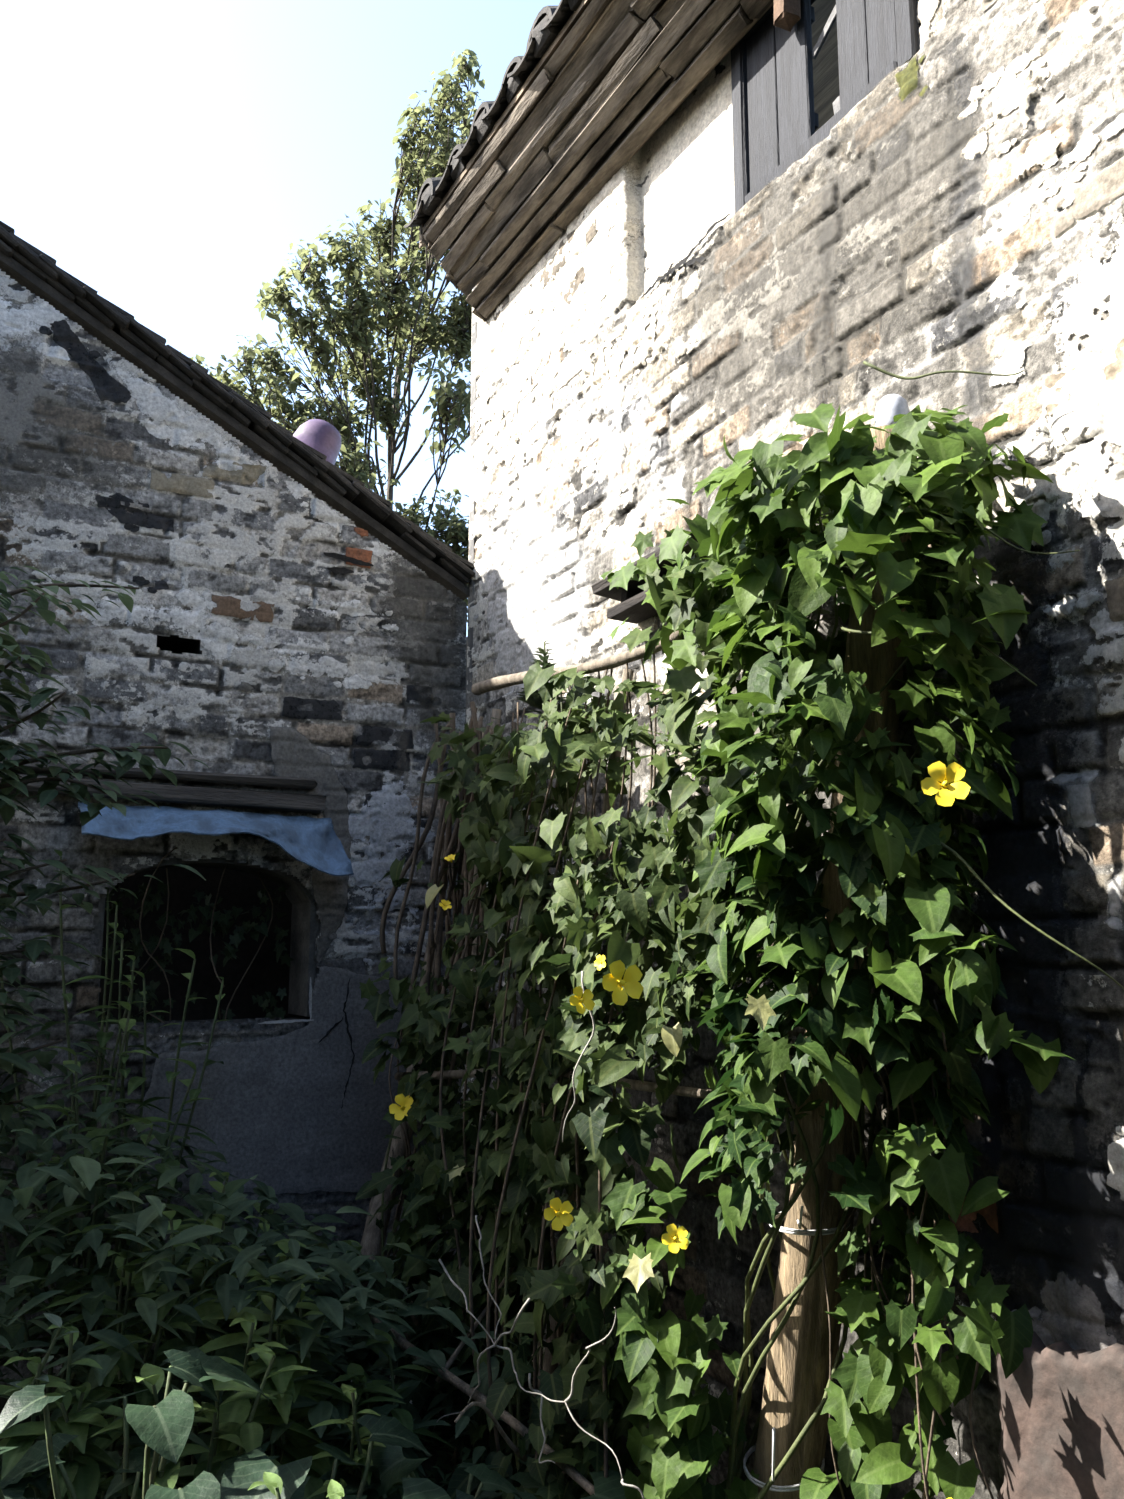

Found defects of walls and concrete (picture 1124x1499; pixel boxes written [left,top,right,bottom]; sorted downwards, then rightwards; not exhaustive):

peeling [957,51,1124,575]
flaking render [0,286,395,574]
peeling [1043,591,1124,665]
spalling [406,685,442,707]
peeling [1053,769,1097,828]
peeling [1106,877,1122,929]
crack [319,979,355,1109]
peeling [1105,1126,1124,1201]
spalling [1011,1271,1119,1352]